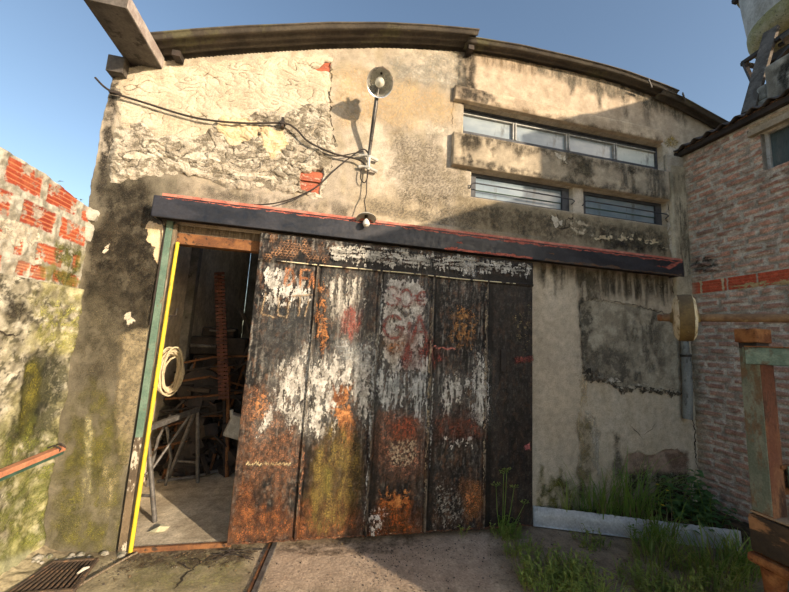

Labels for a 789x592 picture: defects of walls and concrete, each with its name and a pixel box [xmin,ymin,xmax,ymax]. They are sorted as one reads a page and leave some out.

water stain [389,53,501,106]
flaking render [299,170,323,194]
water stain [369,120,666,254]
water stain [4,297,25,318]
water stain [8,77,159,457]
peeling [145,221,163,264]
rust [265,236,328,265]
rust [313,277,329,352]
water stain [541,265,672,305]
peeling [165,198,689,537]
rust [228,382,361,542]
rust [378,410,423,477]